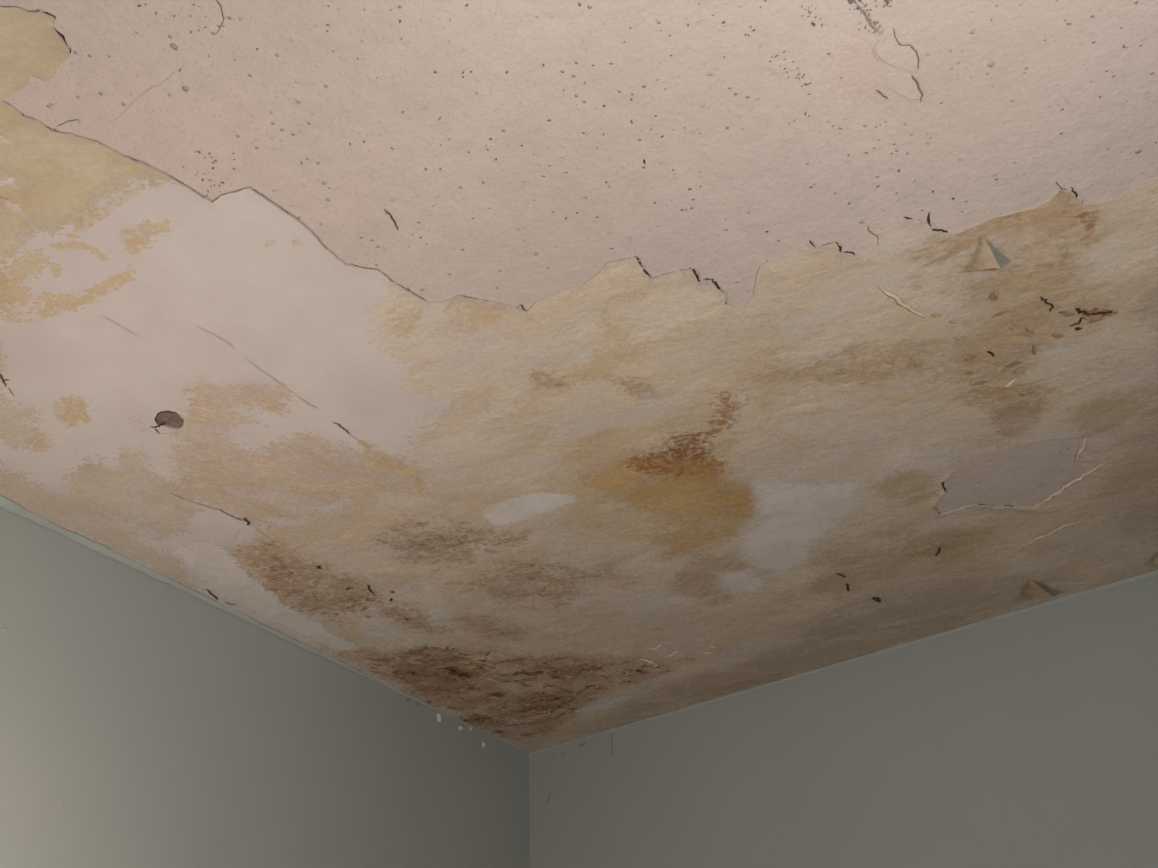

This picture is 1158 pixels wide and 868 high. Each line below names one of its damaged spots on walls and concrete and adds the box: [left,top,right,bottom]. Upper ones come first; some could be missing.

crack [848,0,889,35]
peeling [0,0,1158,311]
crack [1040,297,1112,331]
crack [194,325,371,449]
spalling [150,411,184,434]
water stain [0,179,1158,753]
crack [171,493,273,541]